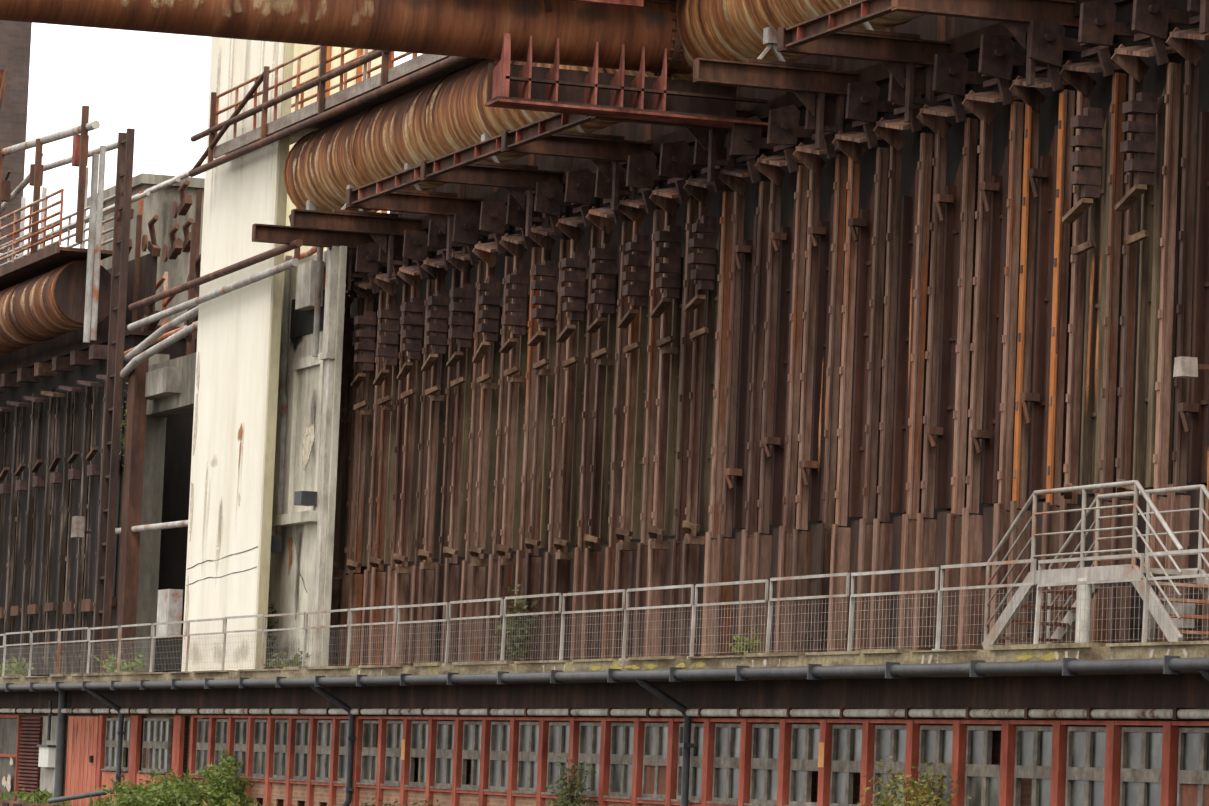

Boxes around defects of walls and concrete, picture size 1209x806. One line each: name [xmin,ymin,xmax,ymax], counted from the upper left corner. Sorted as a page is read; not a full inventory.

crack [186,546,258,586]
crack [294,532,307,620]